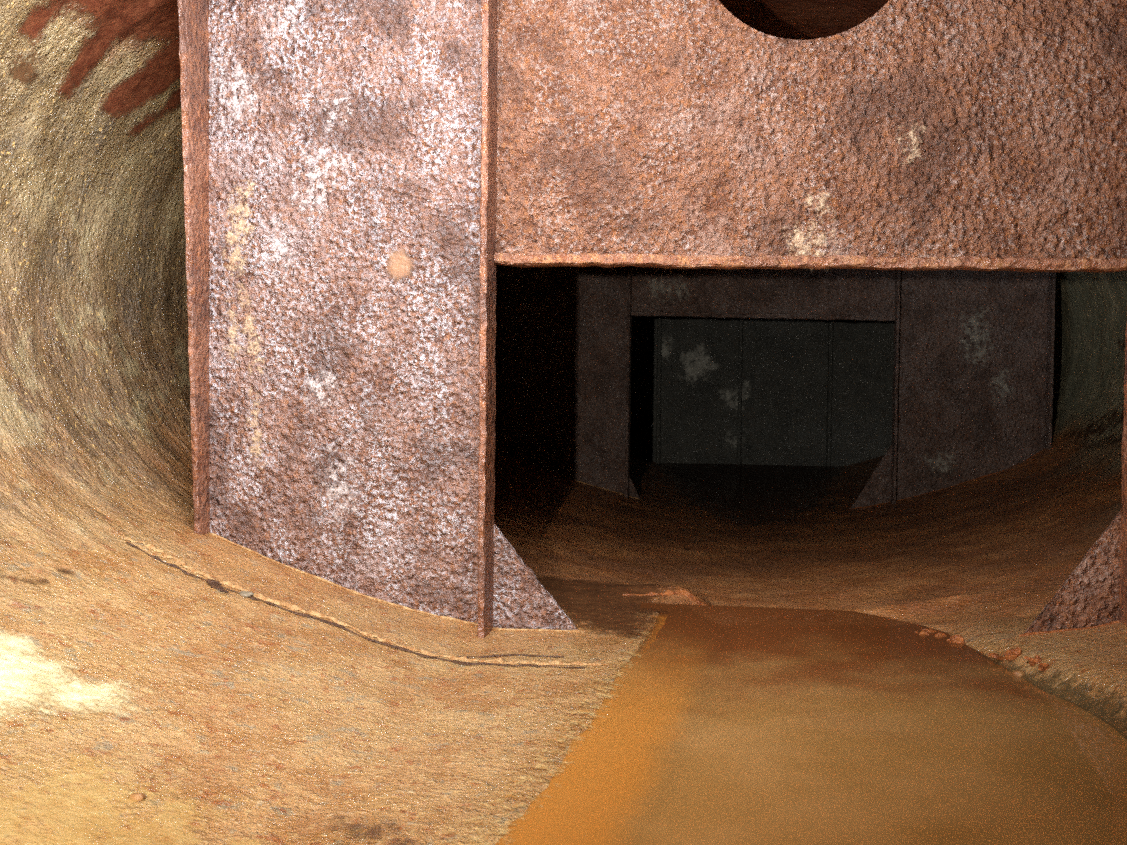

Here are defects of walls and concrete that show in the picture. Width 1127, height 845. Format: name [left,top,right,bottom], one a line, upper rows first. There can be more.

corrosion [10,0,181,136]
corrosion [786,193,834,257]